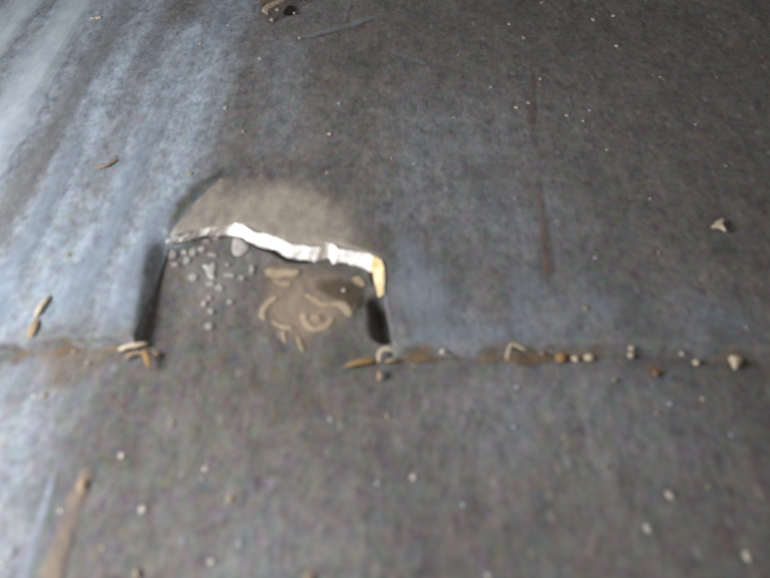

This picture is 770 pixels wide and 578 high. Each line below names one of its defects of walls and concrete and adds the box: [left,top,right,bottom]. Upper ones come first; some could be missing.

leakage [0,0,95,177]
spalling [165,182,384,329]
leakage [42,471,88,578]